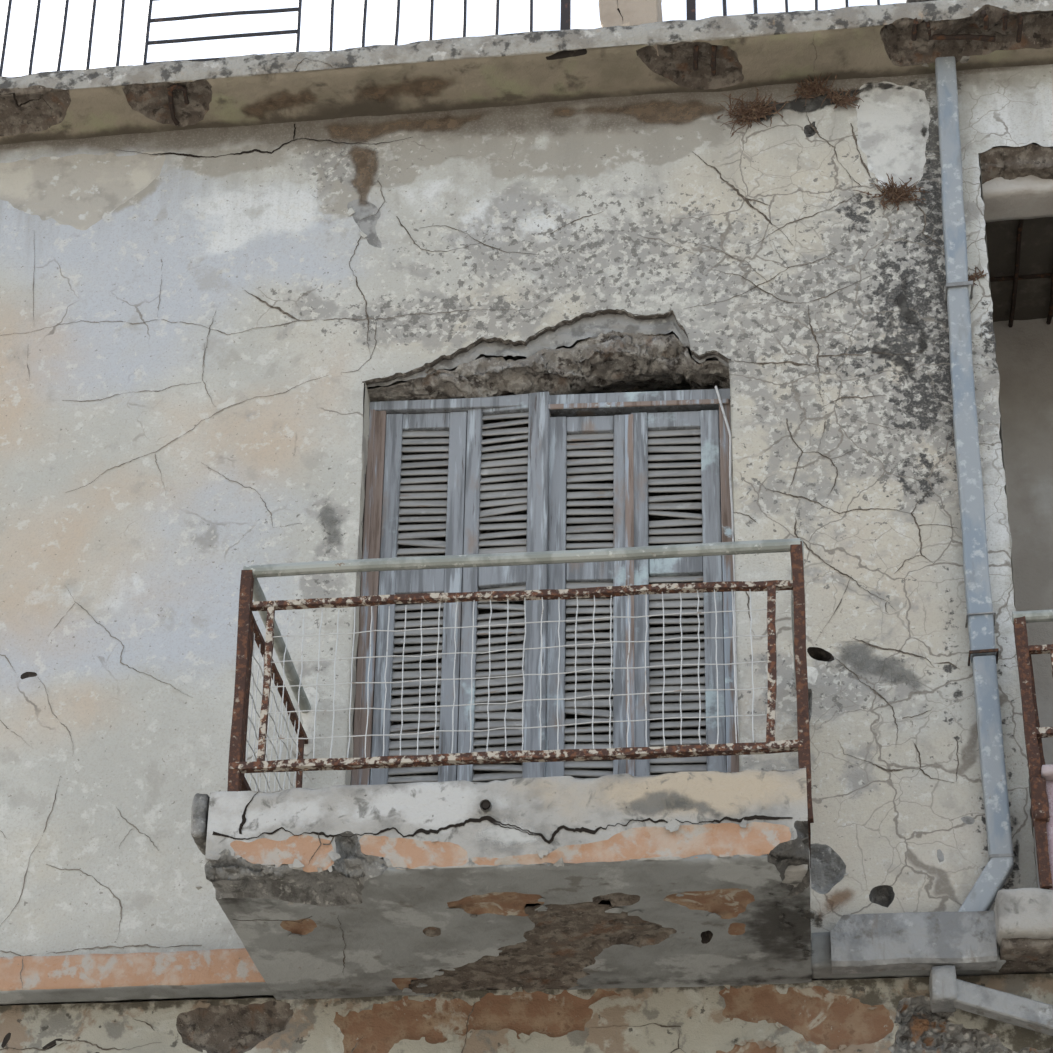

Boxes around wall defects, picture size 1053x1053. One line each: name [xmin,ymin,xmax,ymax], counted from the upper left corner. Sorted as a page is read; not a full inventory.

spalling [880,4,1053,67]
crack [115,124,411,157]
damp [327,114,482,204]
crack [0,181,601,493]
spalling [368,330,730,402]
damp [871,345,912,374]
damp [894,277,928,353]
crack [640,108,959,783]
damp [842,644,917,684]
crack [212,792,793,863]
peeling [195,819,849,907]
peeling [333,892,677,1053]